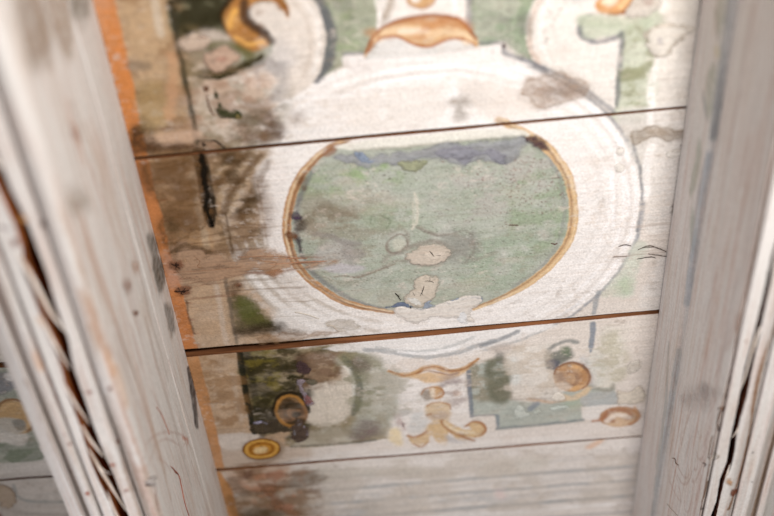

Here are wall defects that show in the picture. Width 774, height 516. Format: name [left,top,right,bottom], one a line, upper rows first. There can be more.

water stain [134,137,190,152]
water stain [144,153,214,289]
water stain [292,214,304,251]
peeling [385,244,482,324]
water stain [187,367,199,427]
crack [701,249,774,516]